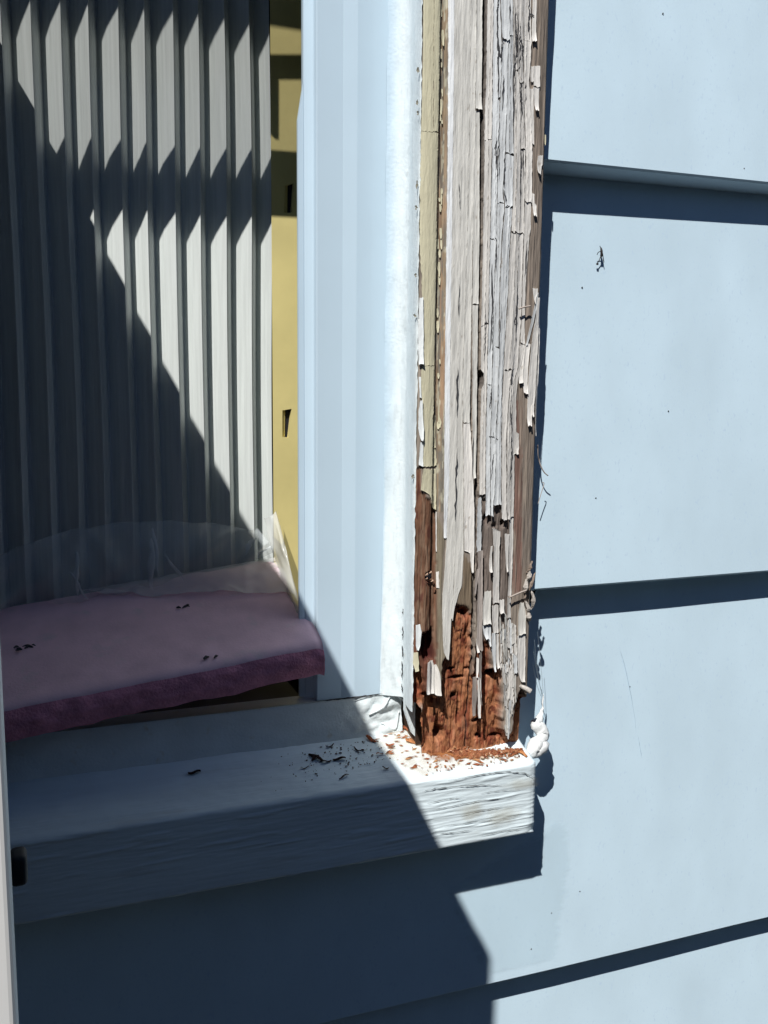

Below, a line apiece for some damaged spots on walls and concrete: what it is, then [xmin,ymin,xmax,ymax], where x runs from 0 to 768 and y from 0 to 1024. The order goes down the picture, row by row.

peeling [411,0,546,739]